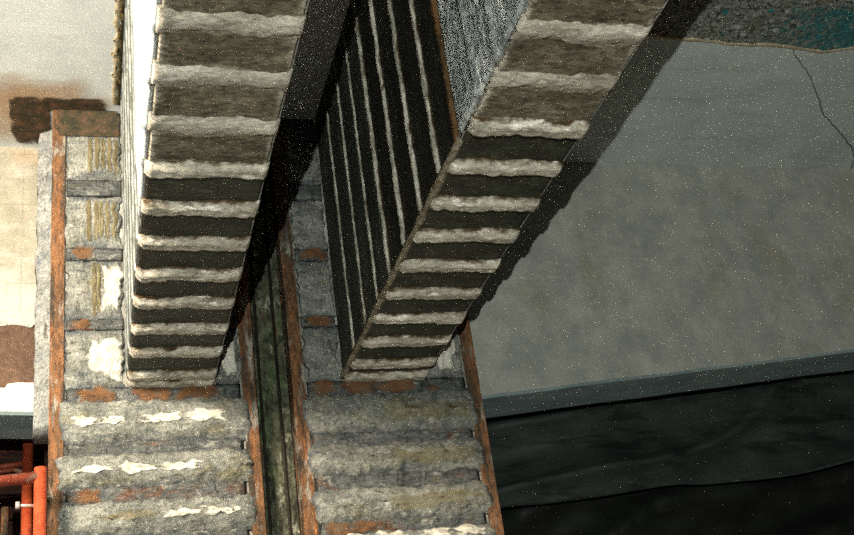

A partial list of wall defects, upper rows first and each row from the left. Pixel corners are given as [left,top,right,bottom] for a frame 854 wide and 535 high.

spalling [647,0,854,53]
corrosion [0,85,120,144]
crack [793,50,854,169]
peeling [0,322,35,412]